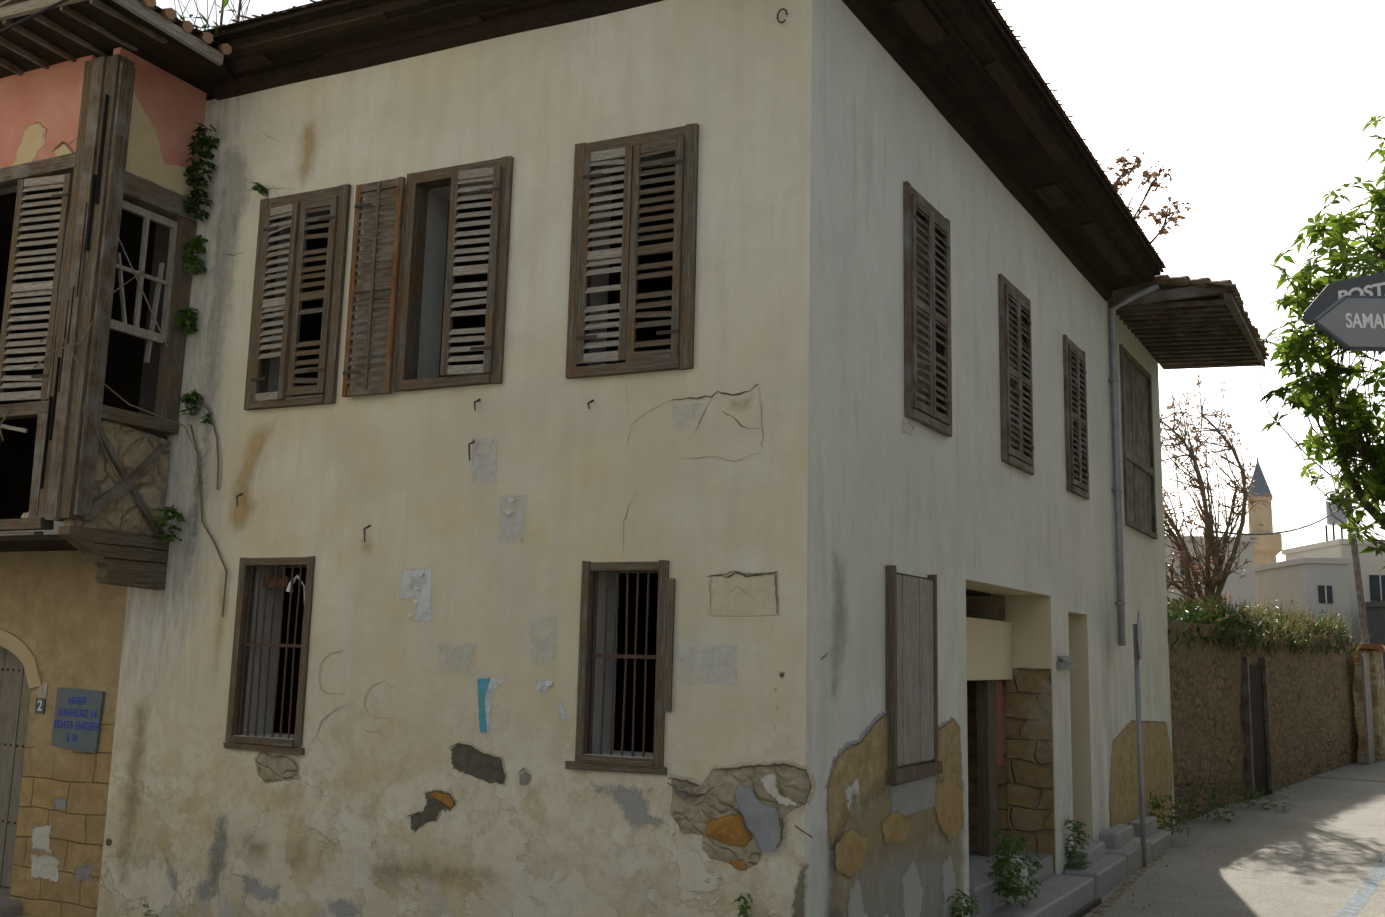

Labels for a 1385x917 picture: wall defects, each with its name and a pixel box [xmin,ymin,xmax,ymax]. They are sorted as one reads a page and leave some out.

peeling [11,121,77,170]
crack [624,380,763,462]
flaking render [254,751,300,783]
flaking render [407,788,458,832]
flaking render [448,741,532,786]
flaking render [598,710,964,870]